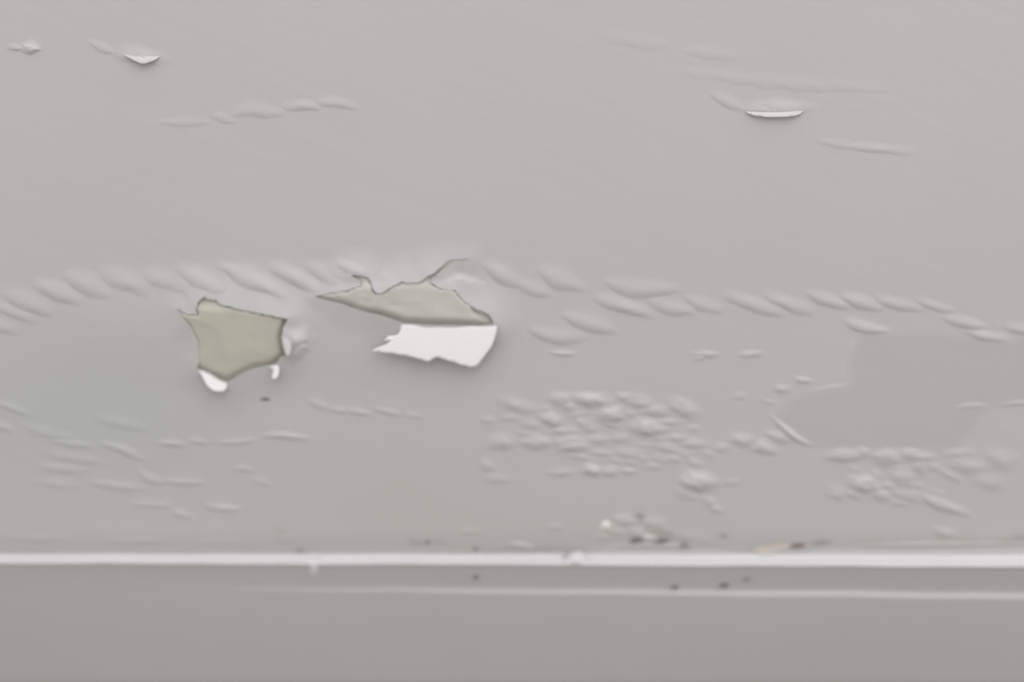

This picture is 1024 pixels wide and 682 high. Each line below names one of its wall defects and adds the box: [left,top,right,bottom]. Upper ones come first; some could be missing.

peeling [86,38,175,67]
peeling [708,89,825,118]
peeling [156,236,530,422]